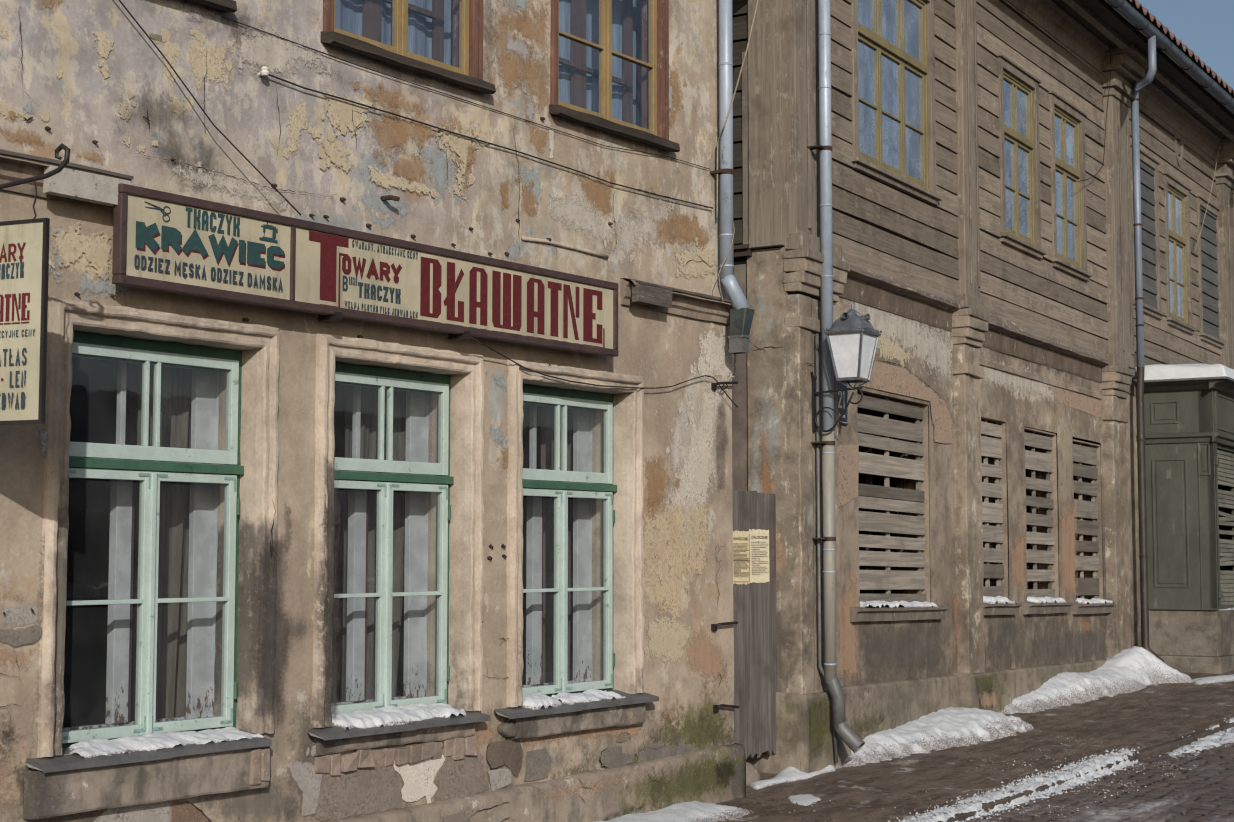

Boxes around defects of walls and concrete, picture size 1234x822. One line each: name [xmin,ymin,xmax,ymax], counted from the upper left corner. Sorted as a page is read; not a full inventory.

peeling [149,26,331,117]
peeling [0,102,44,145]
peeling [173,161,287,210]
peeling [283,81,494,228]
peeling [494,0,720,280]
peeling [642,392,713,664]
peeling [0,594,38,668]
leakage [257,510,303,723]
spalling [32,809,108,822]
spalling [171,801,212,822]
peeling [287,714,693,822]